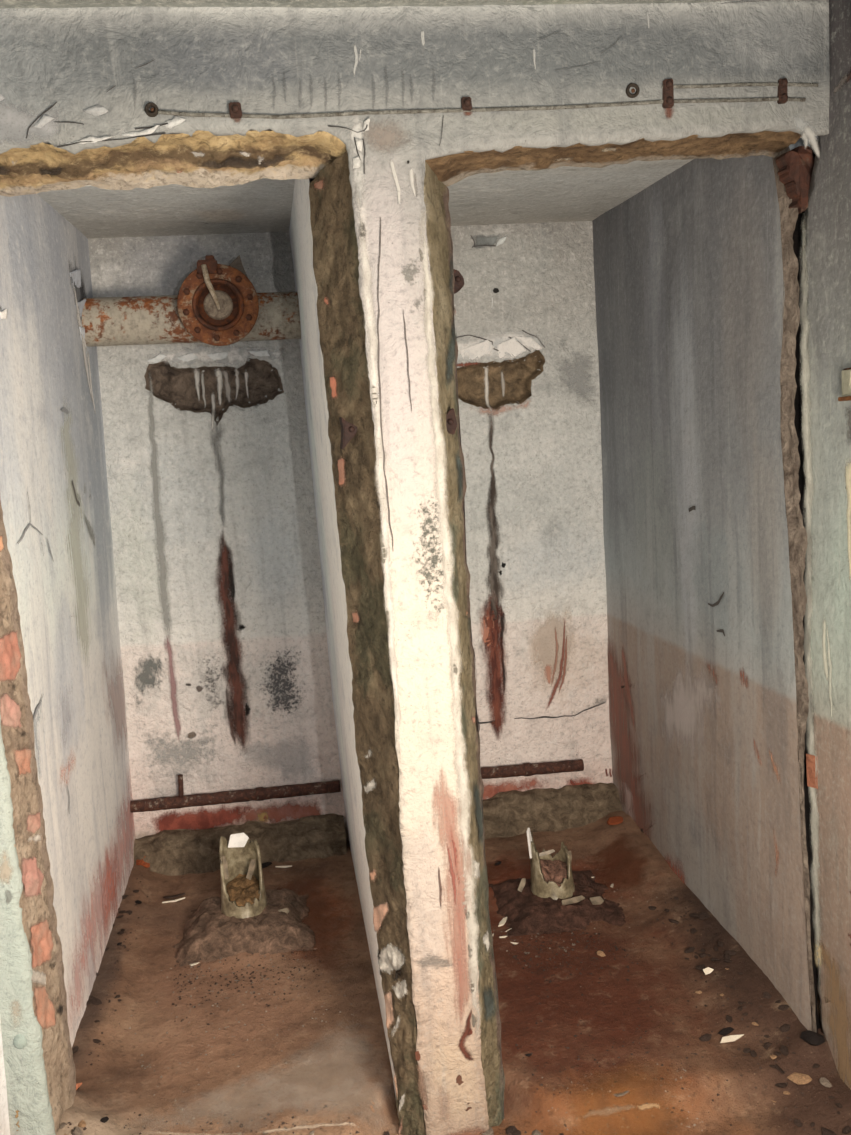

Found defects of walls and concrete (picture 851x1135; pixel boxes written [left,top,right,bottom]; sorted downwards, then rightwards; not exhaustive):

leakage [136,384,213,765]
spalling [0,94,426,1135]
rust [212,428,250,746]
leakage [264,649,301,713]
rust [483,419,505,737]
rust [546,621,567,706]
spalling [420,131,821,1127]
rust [434,778,473,1060]